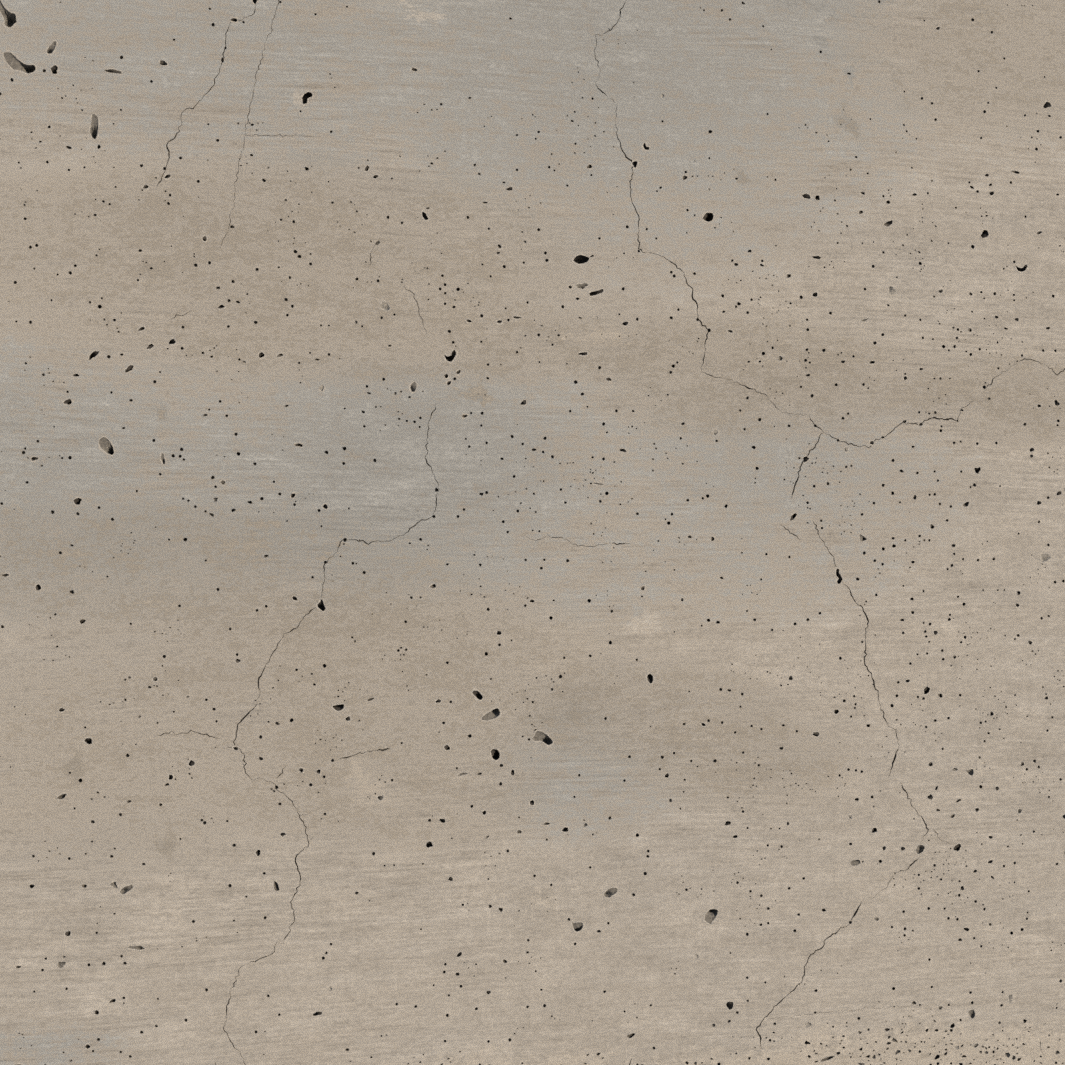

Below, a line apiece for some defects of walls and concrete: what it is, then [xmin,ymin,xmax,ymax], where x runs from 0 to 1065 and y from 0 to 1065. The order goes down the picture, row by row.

crack [157,1,273,186]
crack [594,1,1065,495]
crack [159,403,439,1065]
crack [756,522,946,1051]